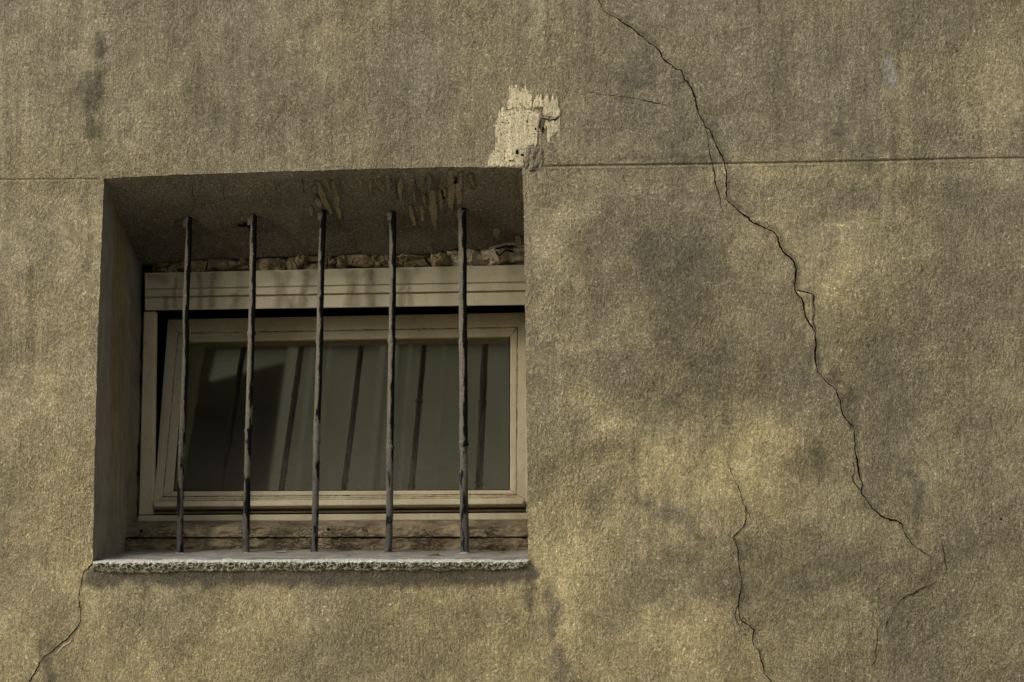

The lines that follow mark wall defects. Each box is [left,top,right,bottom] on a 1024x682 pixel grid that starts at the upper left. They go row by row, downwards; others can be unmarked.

spalling [487,82,561,171]
flaking render [142,242,524,275]
crack [583,0,947,682]
crack [29,563,93,682]